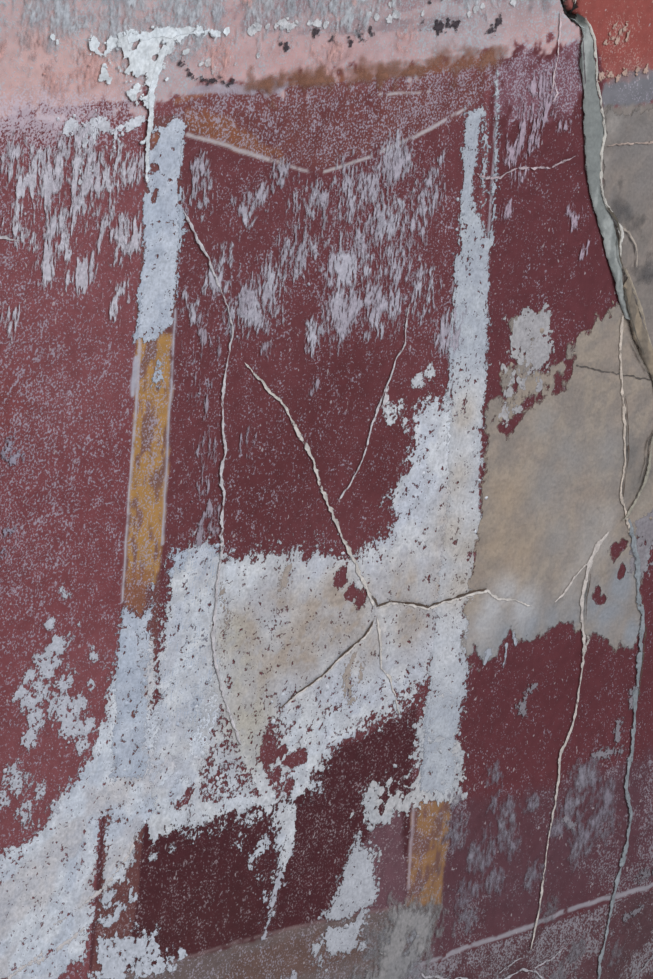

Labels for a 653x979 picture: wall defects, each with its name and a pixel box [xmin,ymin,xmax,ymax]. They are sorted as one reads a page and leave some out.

water stain [567,206,580,232]
flaking render [602,104,653,347]
water stain [0,0,572,845]
crack [185,0,653,979]
flaking render [0,297,653,979]
water stain [459,762,539,933]
water stain [550,683,639,865]
water stain [621,903,645,924]